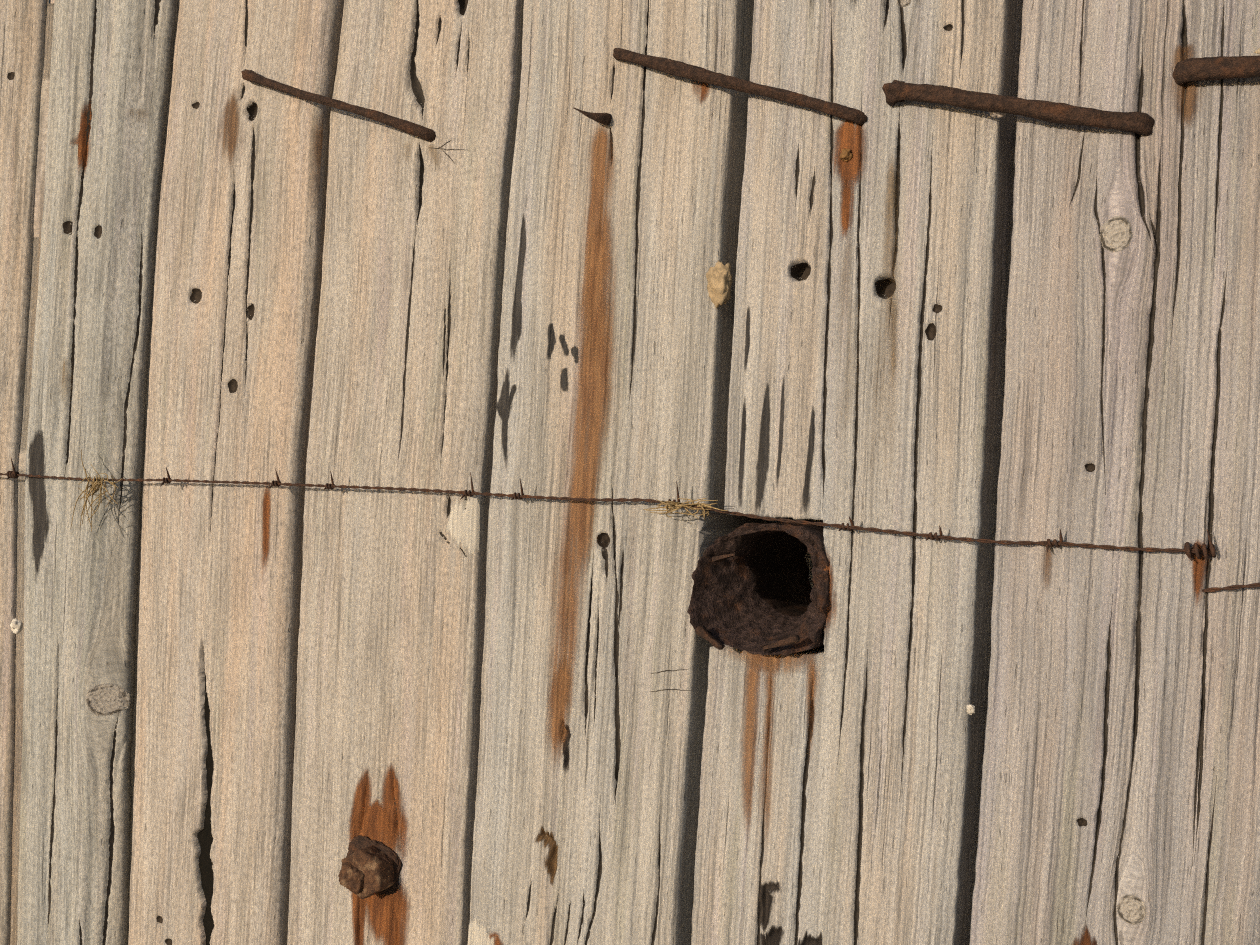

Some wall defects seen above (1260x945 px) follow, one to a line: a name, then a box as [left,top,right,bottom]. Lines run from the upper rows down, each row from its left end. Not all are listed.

corrosion [693,80,708,101]
corrosion [1178,81,1196,121]
corrosion [834,119,863,234]
corrosion [550,129,612,749]
corrosion [1193,543,1207,599]
corrosion [696,626,725,650]
corrosion [744,634,816,816]
crack [197,654,214,945]
corrosion [350,767,407,850]
corrosion [352,887,407,945]
corrosion [1073,926,1097,945]